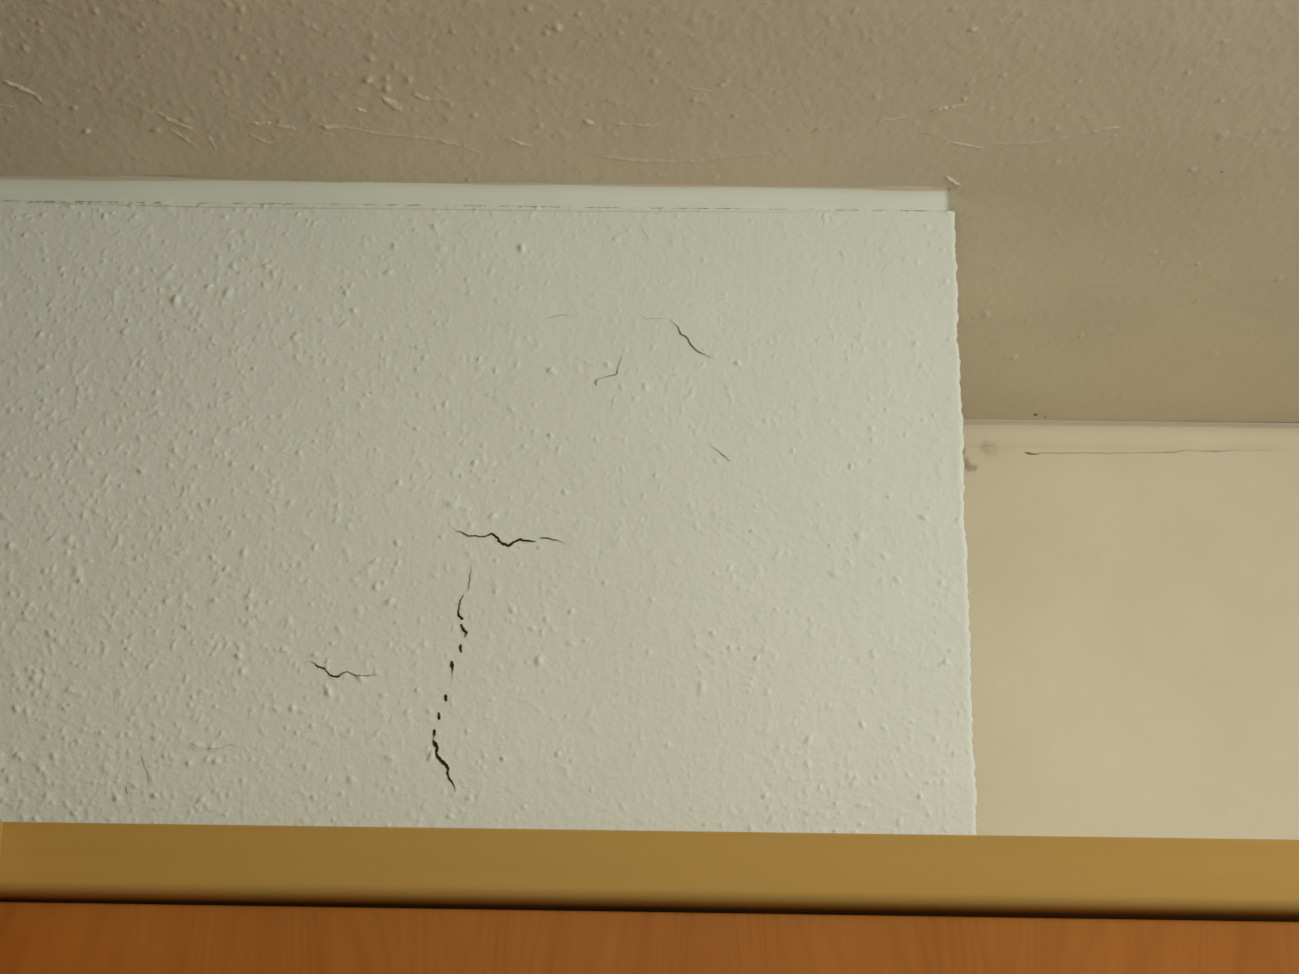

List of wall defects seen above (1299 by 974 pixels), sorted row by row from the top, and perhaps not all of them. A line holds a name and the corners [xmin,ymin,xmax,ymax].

crack [669,322,709,360]
crack [452,530,560,548]
crack [311,662,375,680]
crack [432,570,473,790]